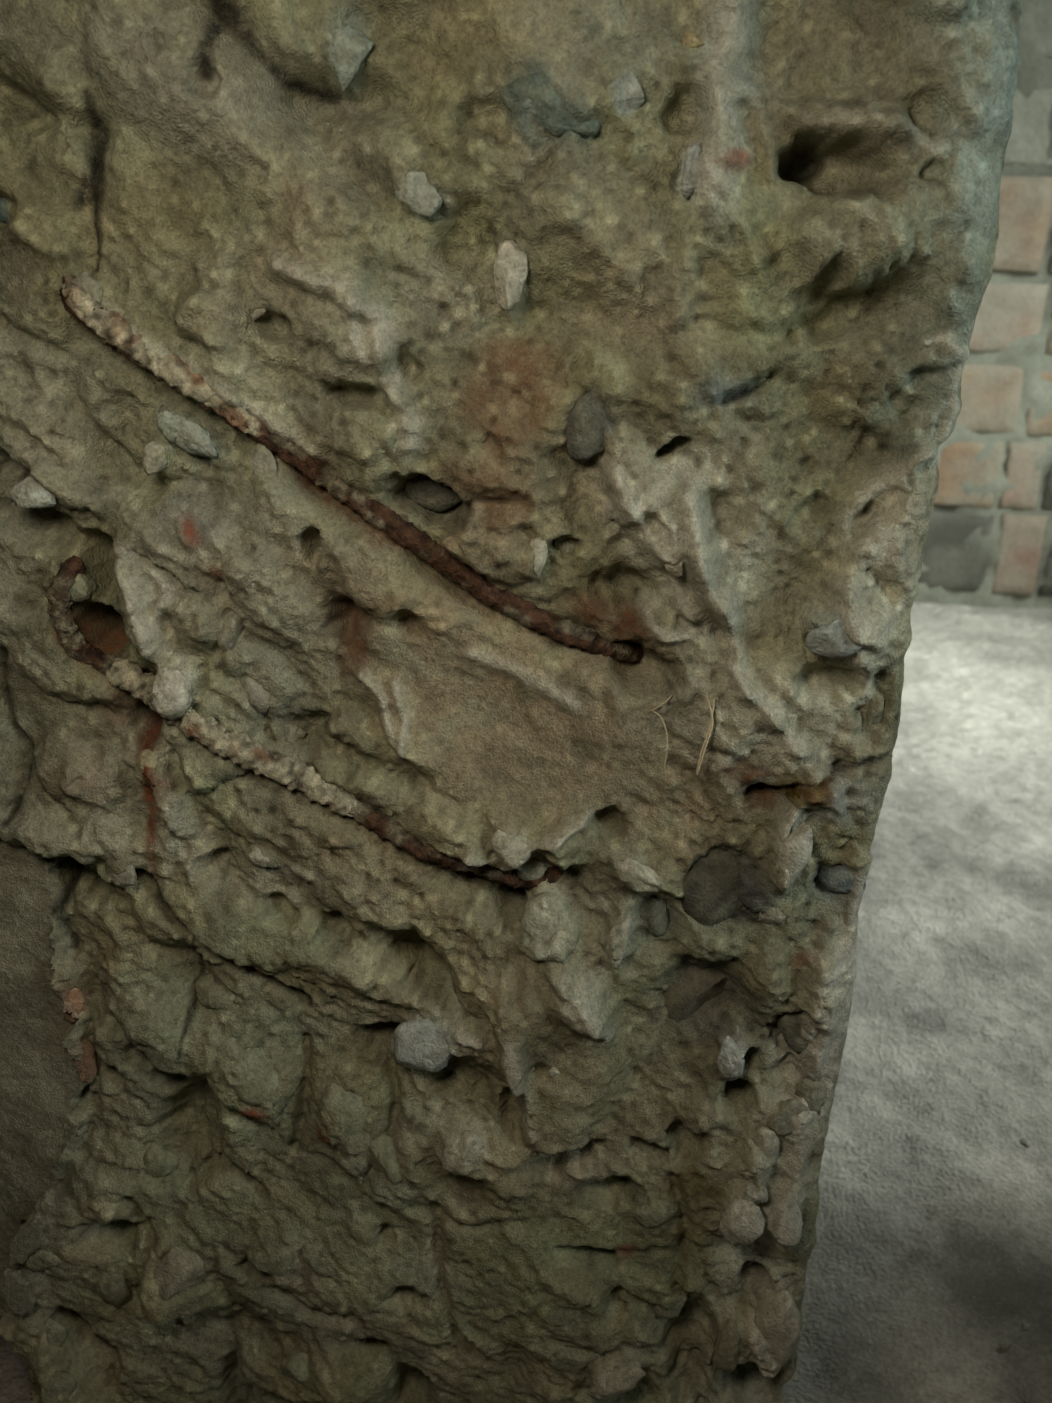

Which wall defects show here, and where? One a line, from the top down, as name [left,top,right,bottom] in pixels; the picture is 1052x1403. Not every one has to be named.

spalling [330,25,374,94]
spalling [395,171,443,217]
spalling [493,239,529,311]
spalling [794,270,959,491]
spalling [797,490,922,677]
spalling [346,607,707,853]
spalling [865,691,885,727]
rust [141,713,163,859]
spalling [492,830,531,870]
spalling [519,891,578,946]
spalling [774,1012,809,1055]
peeling [0,839,98,1315]